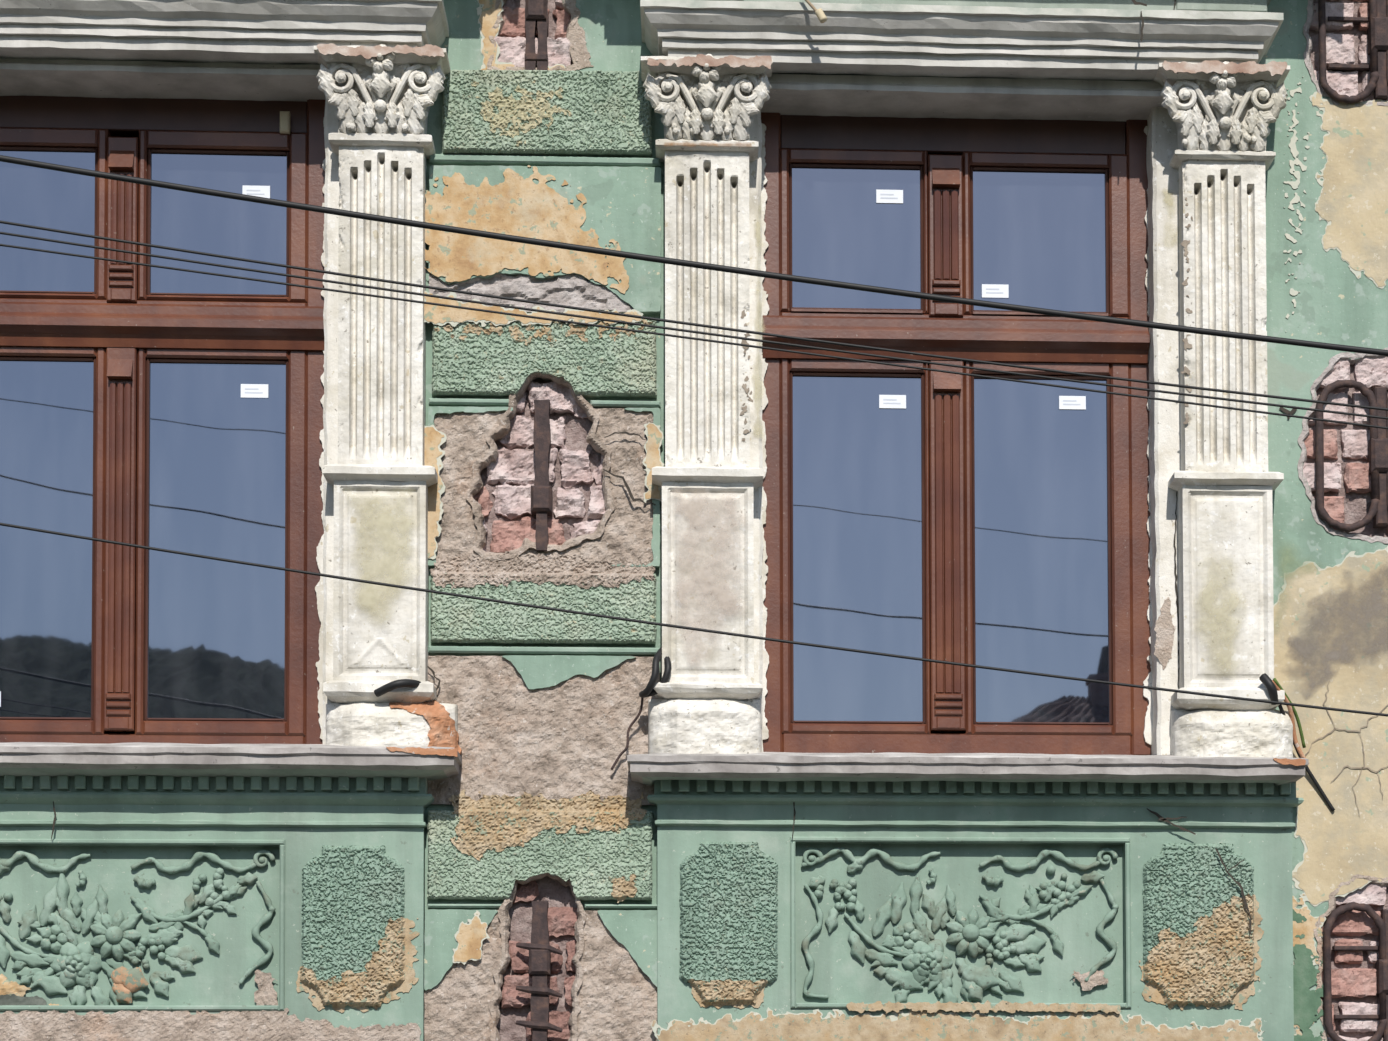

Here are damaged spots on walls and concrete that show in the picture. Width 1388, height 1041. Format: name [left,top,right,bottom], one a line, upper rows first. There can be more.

flaking render [471,0,594,147]
peeling [424,165,652,346]
peeling [1162,0,1388,332]
flaking render [425,373,665,589]
flaking render [386,655,660,861]
peeling [1273,348,1388,1041]
crack [1305,680,1388,817]
peeling [0,873,1264,1041]